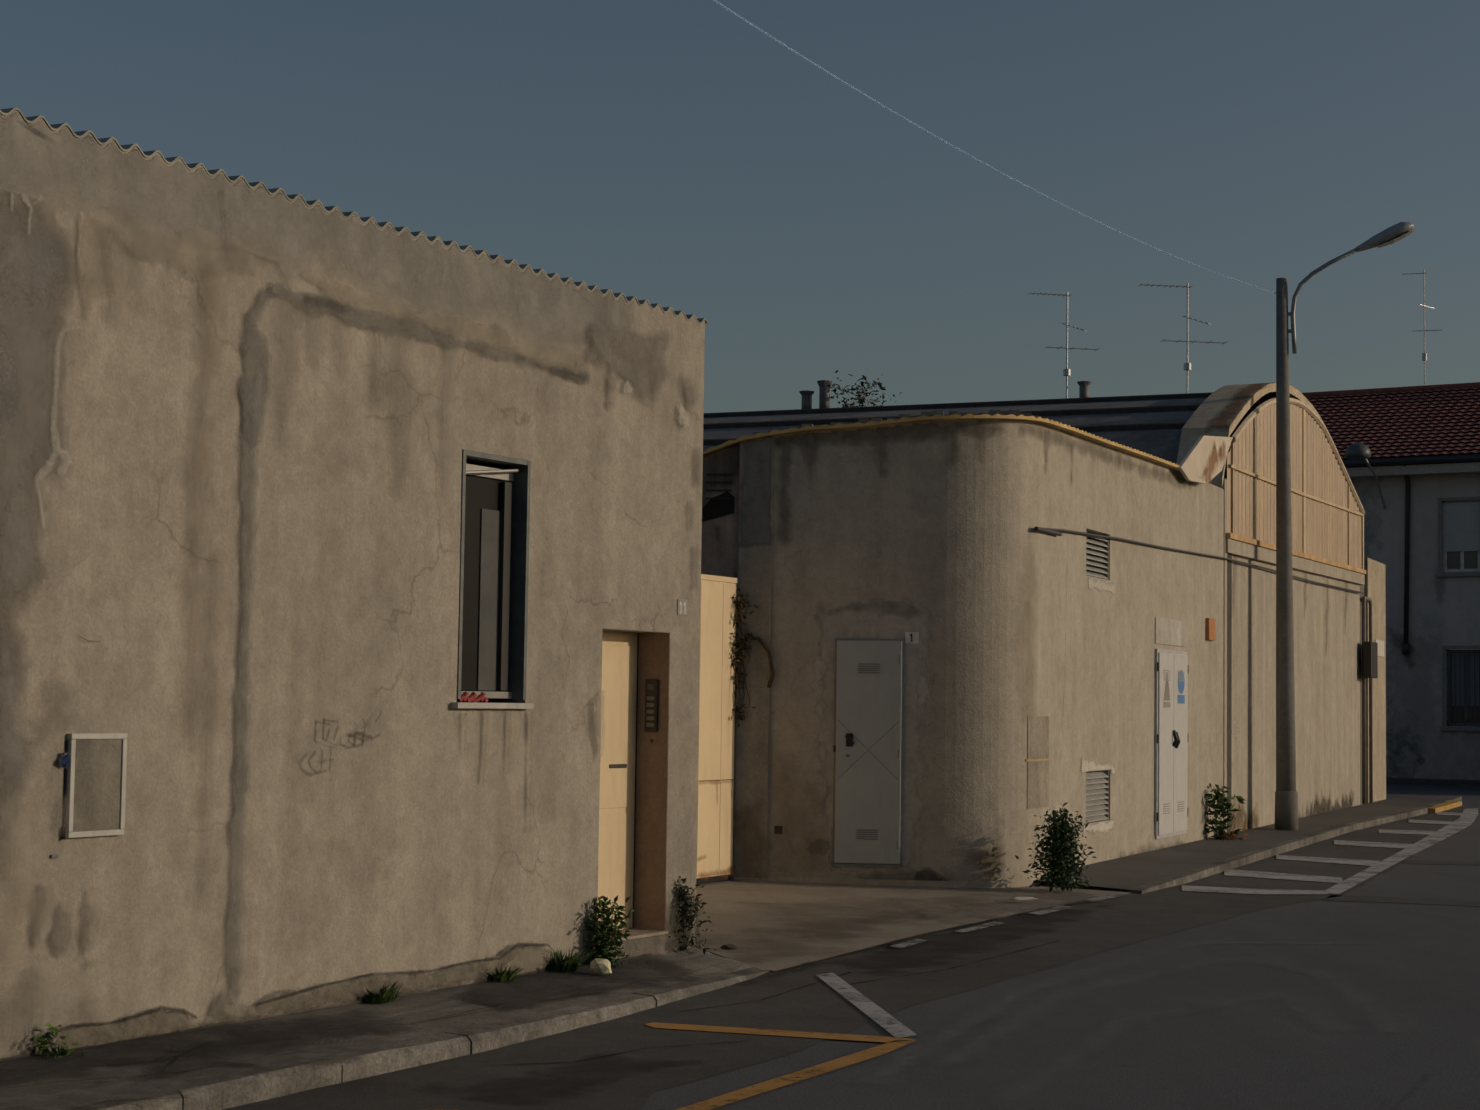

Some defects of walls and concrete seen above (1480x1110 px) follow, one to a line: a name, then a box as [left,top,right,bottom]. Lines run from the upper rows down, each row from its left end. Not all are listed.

leakage [0,202,69,809]
leakage [587,325,668,405]